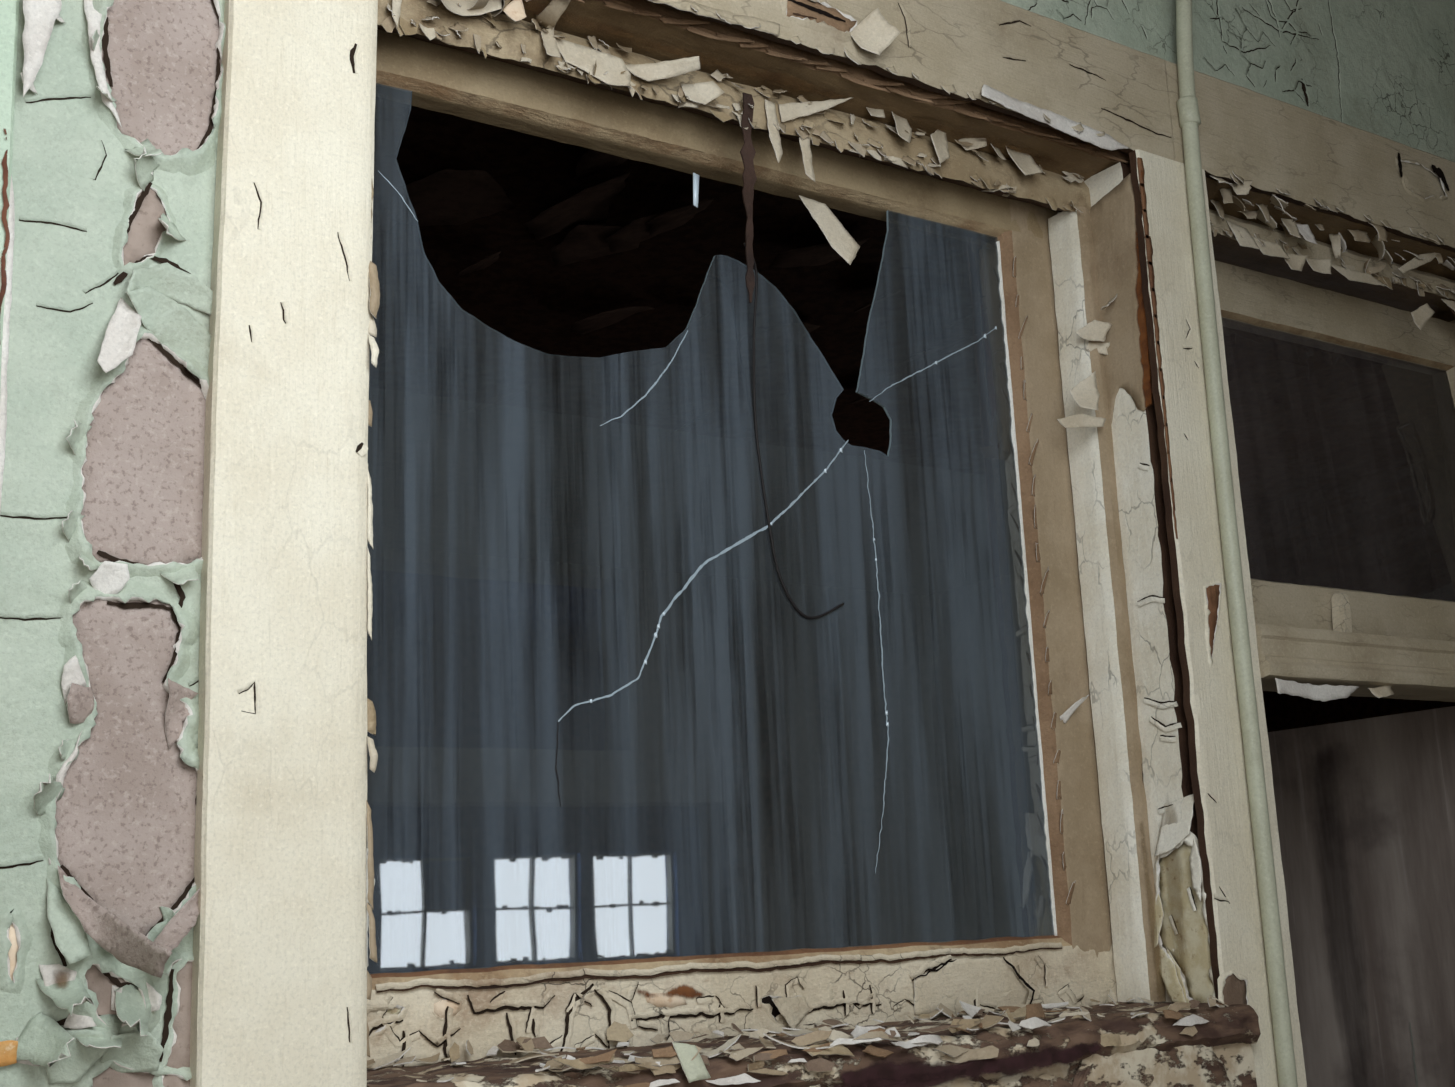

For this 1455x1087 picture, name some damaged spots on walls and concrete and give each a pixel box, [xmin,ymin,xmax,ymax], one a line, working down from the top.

crack [997,0,1149,61]
crack [1069,60,1172,138]
crack [1202,0,1344,123]
peeling [371,0,1147,428]
peeling [1210,170,1455,330]
peeling [368,261,386,368]
peeling [0,0,226,1087]
peeling [367,698,378,773]
crack [1144,697,1182,742]
peeling [366,794,1249,1087]
crack [1169,884,1231,935]
crack [347,942,1084,1067]